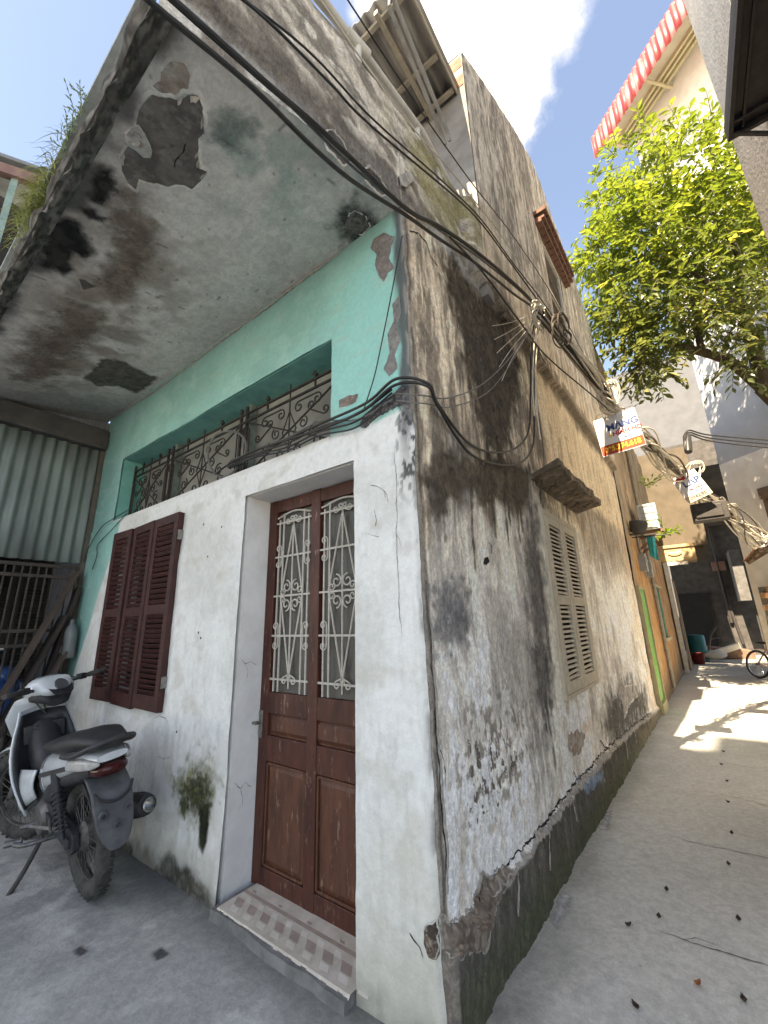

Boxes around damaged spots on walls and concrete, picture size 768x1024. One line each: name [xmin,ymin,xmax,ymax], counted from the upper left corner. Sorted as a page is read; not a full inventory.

flaking render [118,57,211,193]
water stain [41,167,159,296]
peeling [343,211,395,283]
water stain [13,305,97,382]
peeling [383,294,402,378]
peeling [338,393,359,409]
water stain [420,253,556,764]
flaking render [568,729,585,756]
crack [478,713,656,916]
spalling [423,864,515,961]